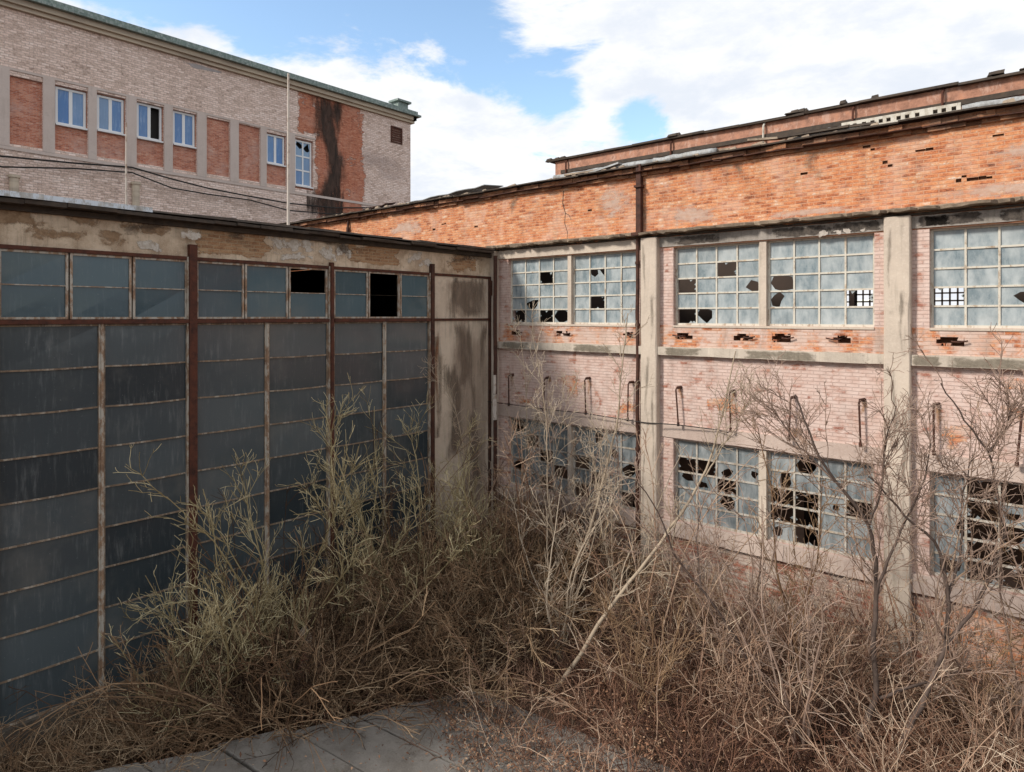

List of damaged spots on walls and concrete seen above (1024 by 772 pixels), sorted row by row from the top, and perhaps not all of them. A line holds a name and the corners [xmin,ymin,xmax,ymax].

spalling [0,210,431,267]
leakage [452,278,483,316]
spalling [772,333,794,342]
spalling [826,335,852,343]
spalling [936,337,968,346]
leakage [438,327,486,479]